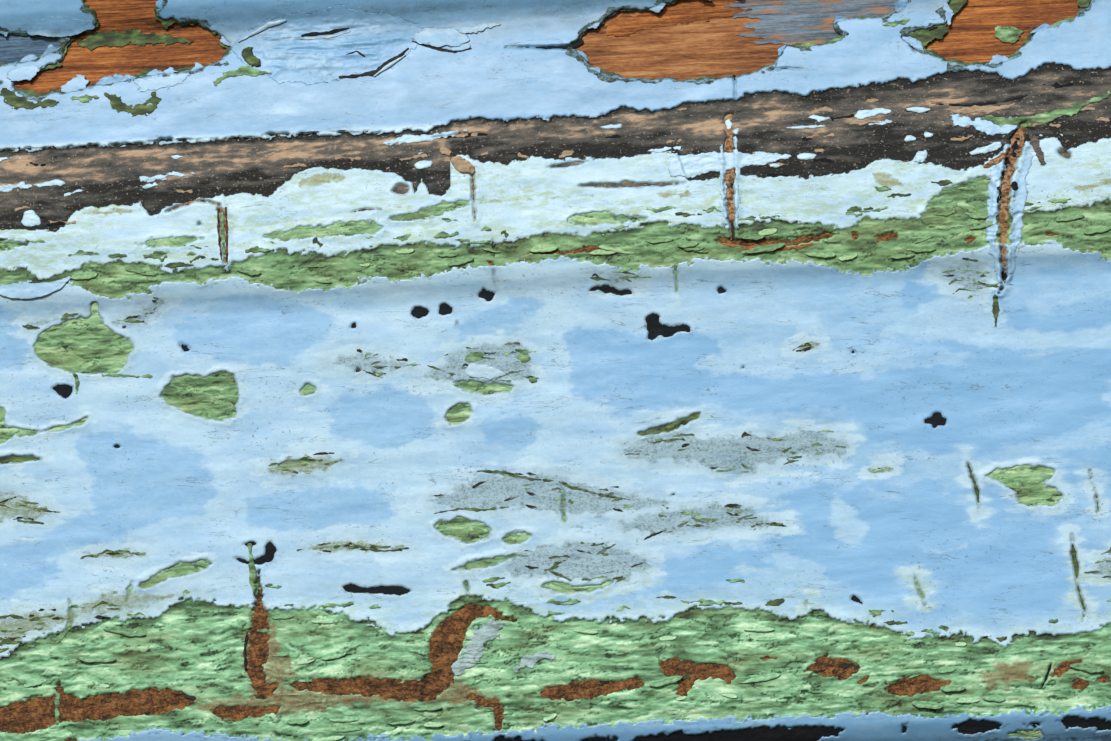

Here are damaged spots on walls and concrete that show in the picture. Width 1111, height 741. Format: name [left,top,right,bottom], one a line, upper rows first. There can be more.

crack [931,95,1027,107]
peeling [0,0,1111,399]
crack [720,114,741,240]
crack [983,127,1046,327]
peeling [160,371,239,421]
peeling [0,408,87,443]
peeling [0,455,40,464]
peeling [435,517,490,543]
peeling [0,533,1111,741]